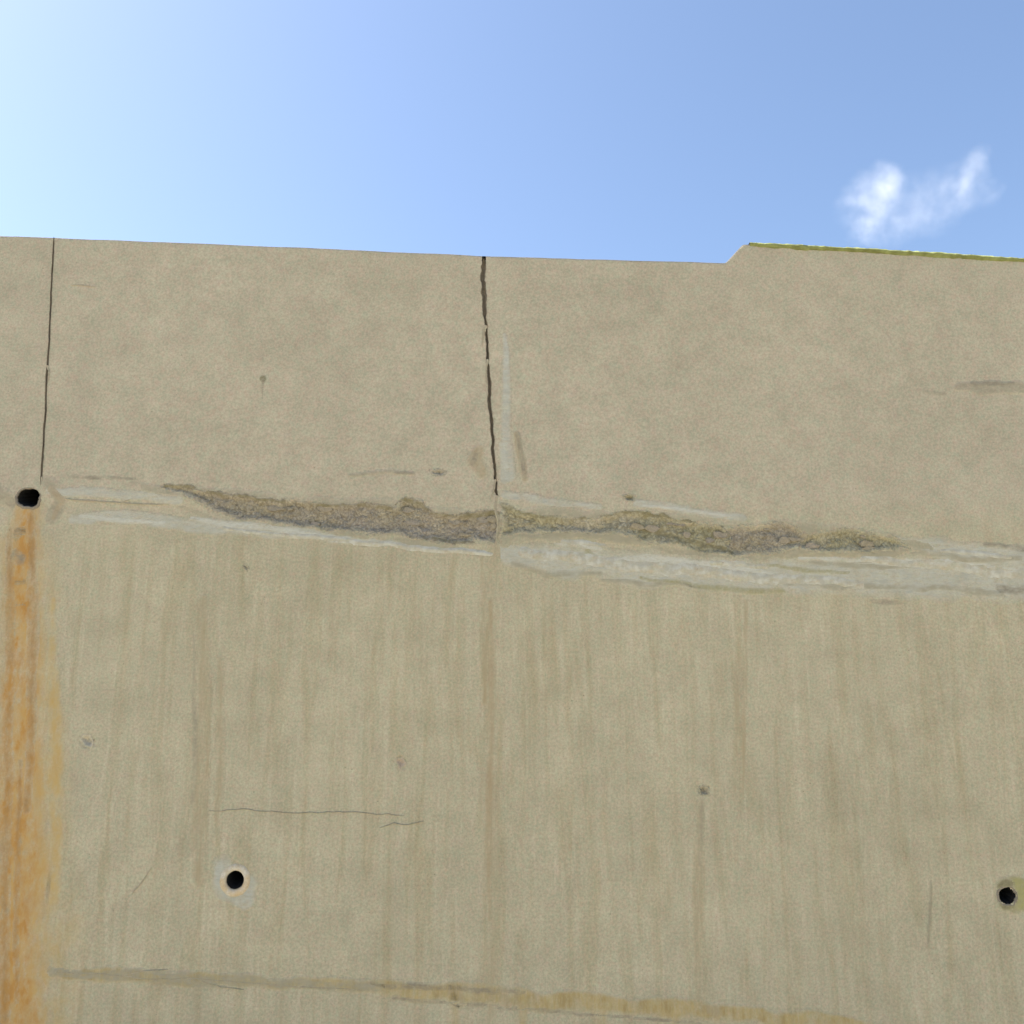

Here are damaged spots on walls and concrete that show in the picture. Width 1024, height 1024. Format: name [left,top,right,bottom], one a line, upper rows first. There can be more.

leakage [0,485,16,508]
crack [40,238,94,484]
crack [480,258,500,544]
spalling [157,483,912,558]
corrosion [0,494,98,1024]
leakage [40,474,1024,1024]